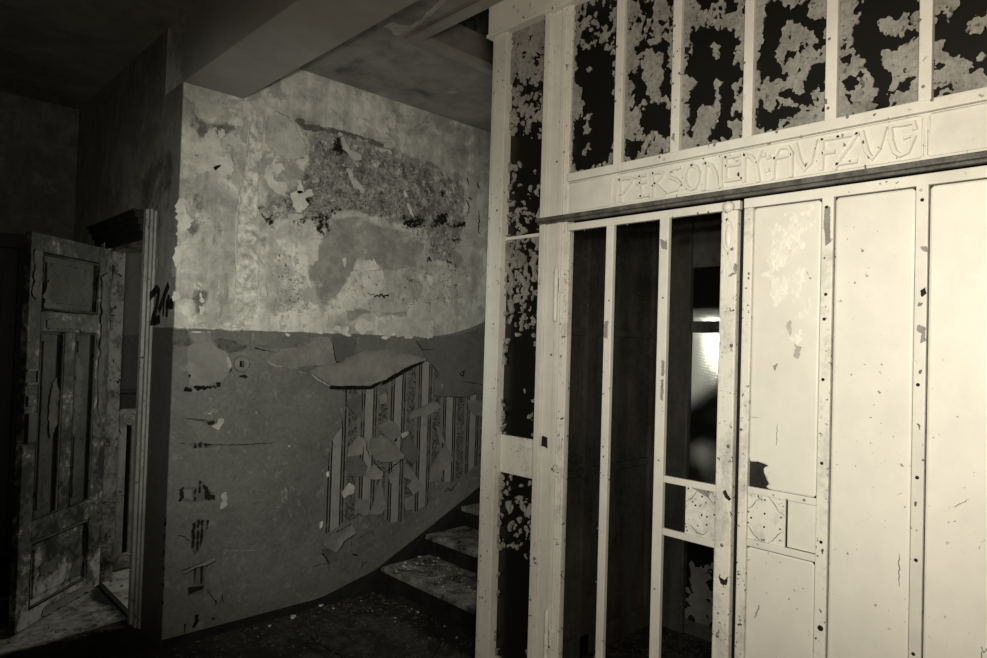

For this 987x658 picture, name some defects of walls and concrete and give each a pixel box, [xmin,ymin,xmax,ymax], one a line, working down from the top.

peeling [509,19,545,139]
peeling [570,0,827,173]
peeling [838,0,920,118]
peeling [934,0,960,24]
peeling [933,39,987,97]
peeling [965,14,987,35]
peeling [264,113,313,220]
peeling [338,132,365,193]
peeling [502,161,541,365]
peeling [523,388,548,448]
peeling [342,426,453,515]
peeling [497,474,532,559]